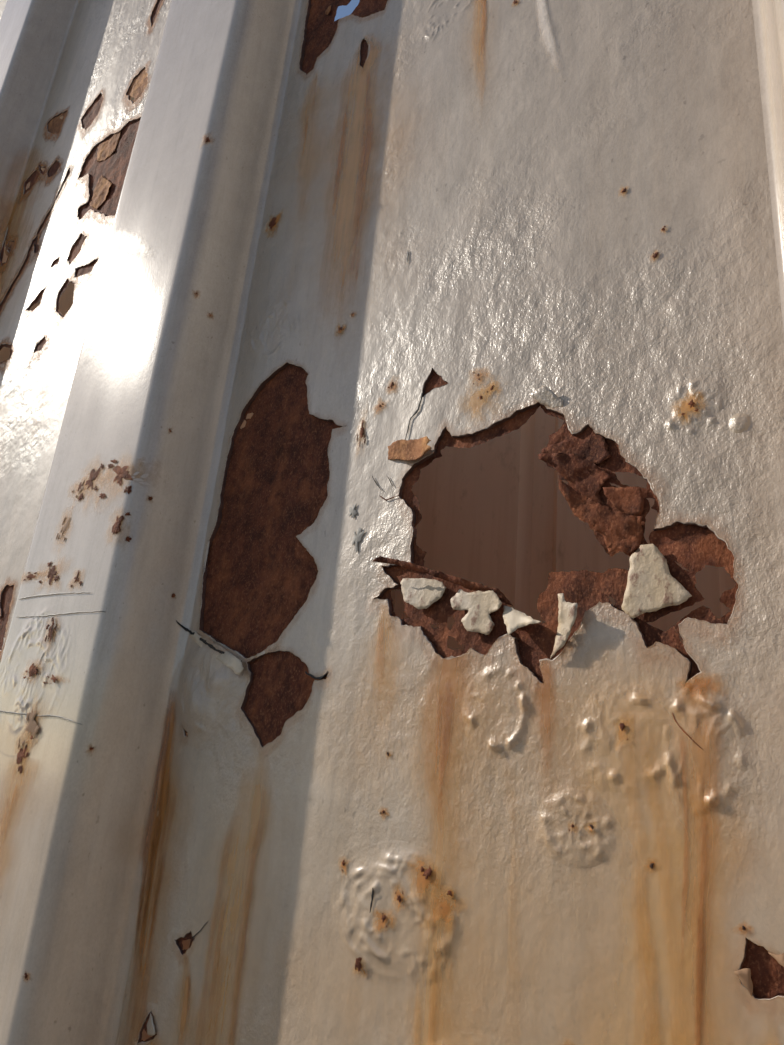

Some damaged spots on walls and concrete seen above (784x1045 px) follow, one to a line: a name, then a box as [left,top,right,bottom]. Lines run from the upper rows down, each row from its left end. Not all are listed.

corrosion [359,38,368,68]
peeling [48,231,98,287]
peeling [539,426,692,619]
peeling [0,561,59,661]
peeling [400,578,502,635]
peeling [550,593,578,659]
corrosion [435,657,459,785]
corrosion [540,663,552,735]
corrosion [139,705,174,1001]
corrosion [375,860,454,930]
corrosion [685,721,714,1045]
peeling [734,937,784,1000]